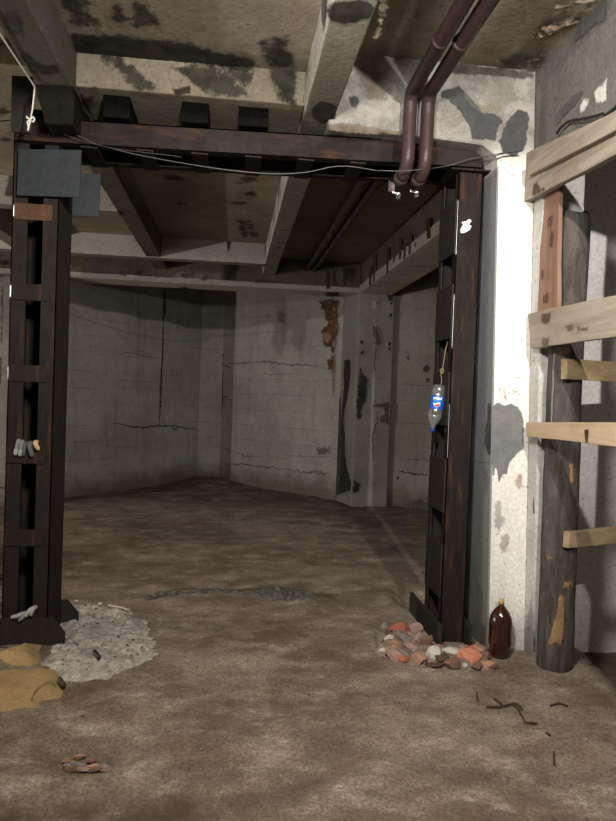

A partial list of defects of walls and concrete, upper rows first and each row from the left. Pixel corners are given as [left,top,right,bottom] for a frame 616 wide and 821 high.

water stain [62,0,255,97]
water stain [259,35,402,135]
water stain [321,0,374,29]
peeling [533,0,606,41]
crack [221,332,329,411]
corrosion [319,298,340,390]
crack [222,447,329,475]
water stain [316,360,367,496]